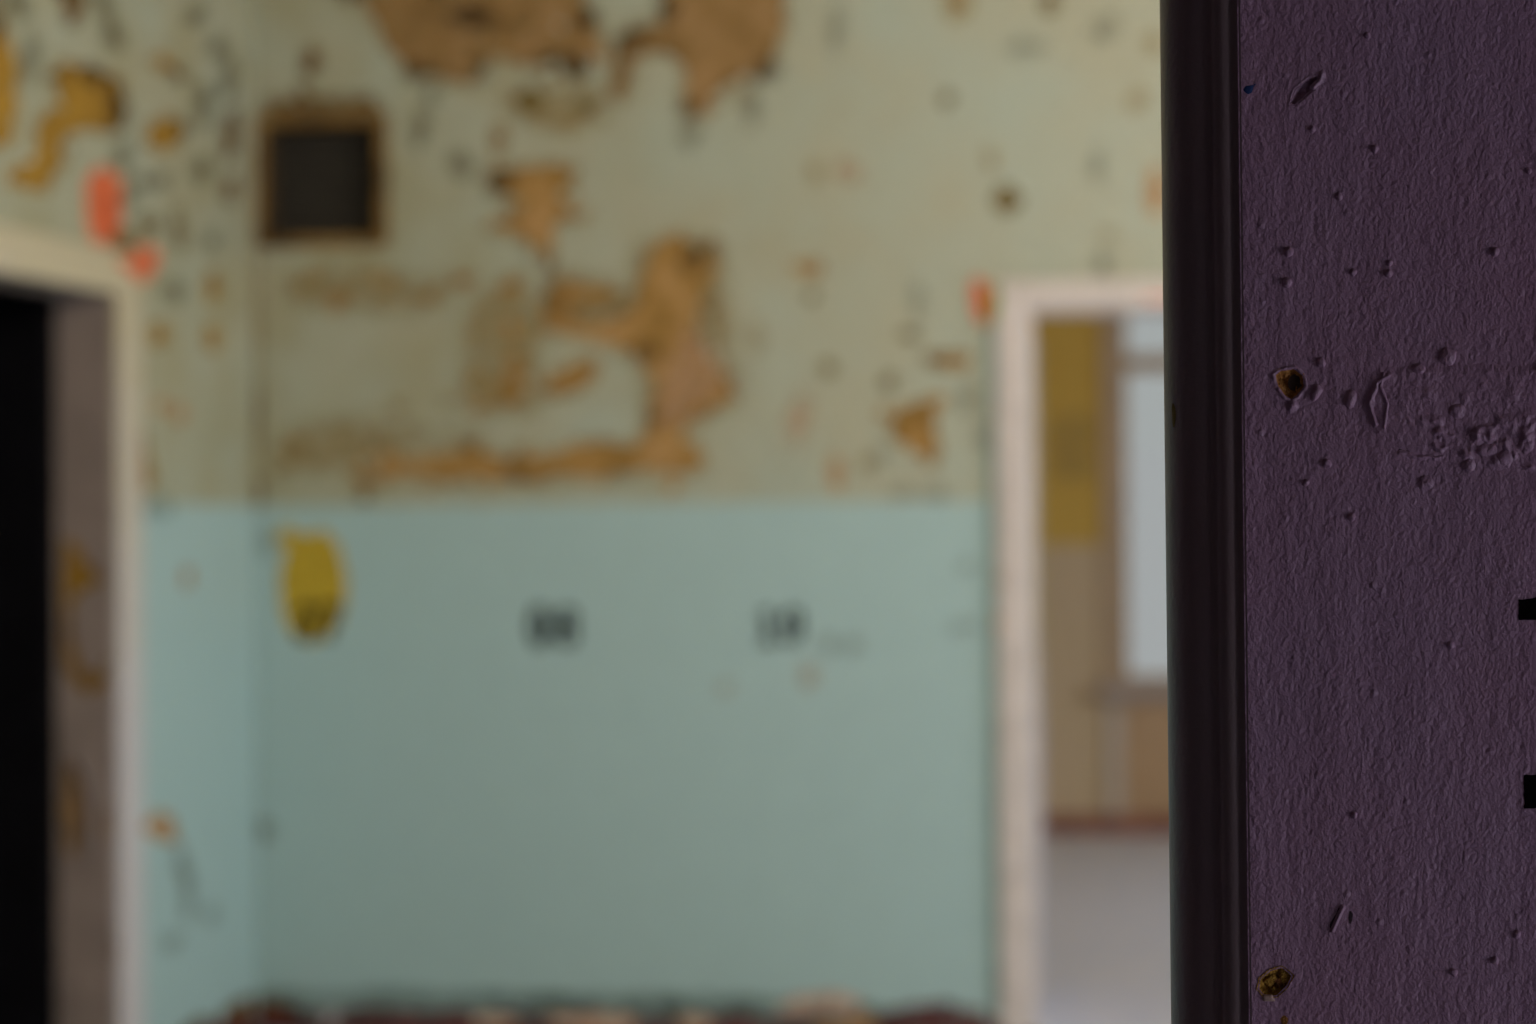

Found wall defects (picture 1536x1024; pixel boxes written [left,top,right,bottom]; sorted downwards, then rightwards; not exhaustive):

peeling [60,0,86,28]
peeling [0,15,189,194]
peeling [343,0,788,118]
peeling [348,150,743,504]